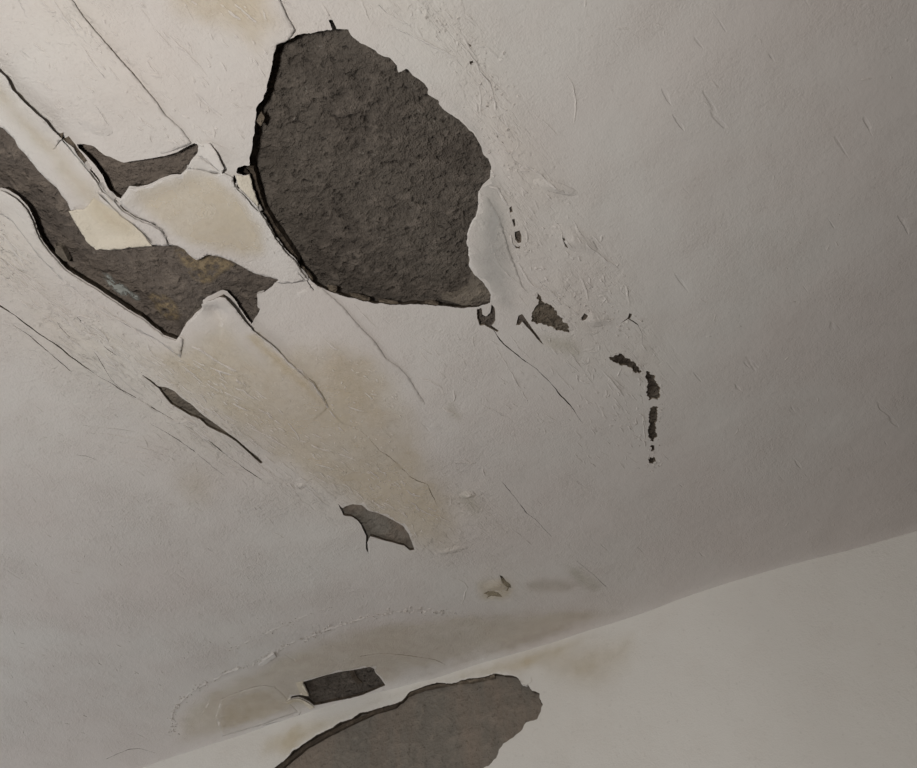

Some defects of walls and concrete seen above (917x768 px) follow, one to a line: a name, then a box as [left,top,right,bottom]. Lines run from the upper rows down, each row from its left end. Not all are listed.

flaking render [0,0,524,420]
flaking render [516,294,642,345]
crack [0,305,262,480]
flaking render [144,376,262,463]
flaking render [338,504,414,552]
peeling [216,667,385,736]
flaking render [275,673,543,768]